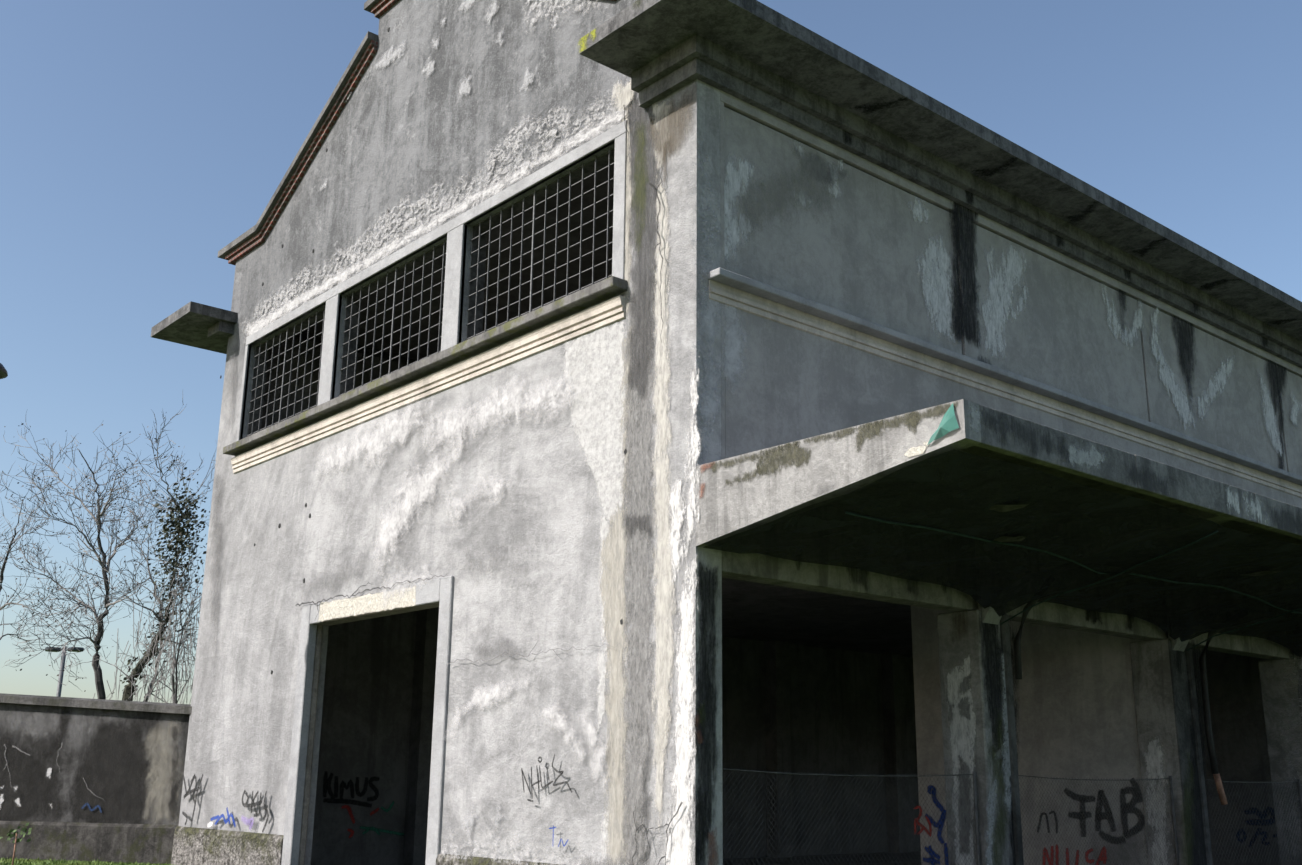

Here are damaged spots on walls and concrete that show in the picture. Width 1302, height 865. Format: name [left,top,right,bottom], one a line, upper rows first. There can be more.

leakage [916,190,1027,365]
leakage [581,97,691,865]
leakage [711,403,1103,484]
leakage [1102,269,1233,428]
leakage [1227,488,1302,535]
leakage [1260,337,1302,470]
crack [296,574,447,619]
leakage [0,710,157,824]
leakage [169,730,178,818]
leakage [694,563,718,865]
leakage [952,613,1019,774]